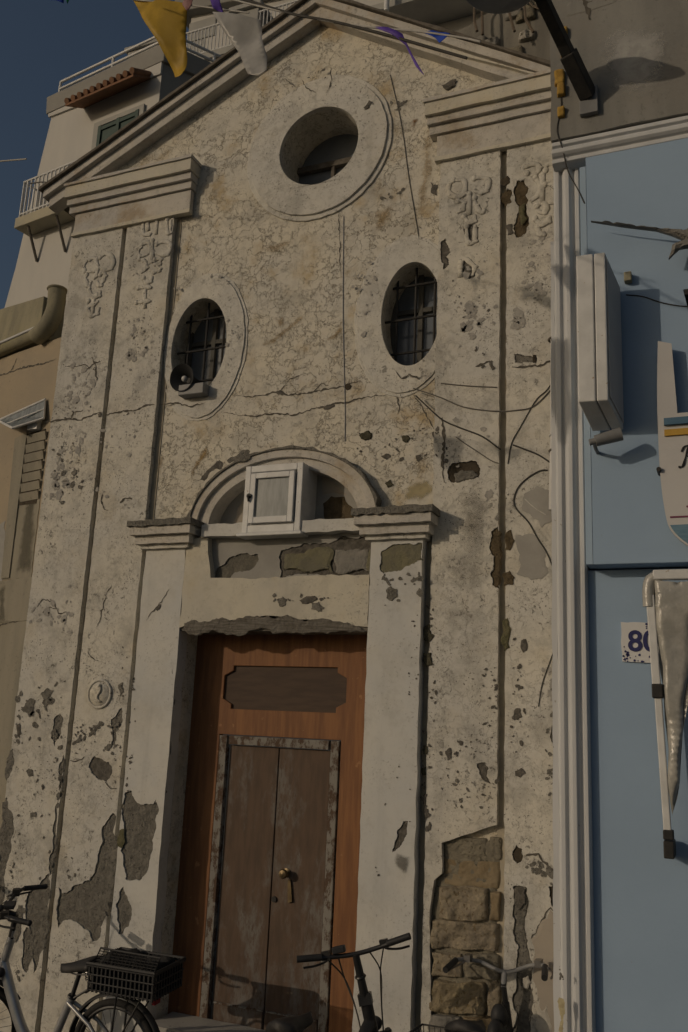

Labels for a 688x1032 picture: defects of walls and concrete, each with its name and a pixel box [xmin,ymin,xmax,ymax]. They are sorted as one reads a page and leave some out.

spalling [441,240,450,269]
spalling [500,176,551,308]
peeling [448,260,498,347]
peeling [510,307,525,330]
spalling [448,417,494,501]
spalling [215,553,259,578]
spalling [280,536,424,606]
spalling [490,527,515,590]
spalling [0,677,159,982]
flaking render [427,836,565,1032]